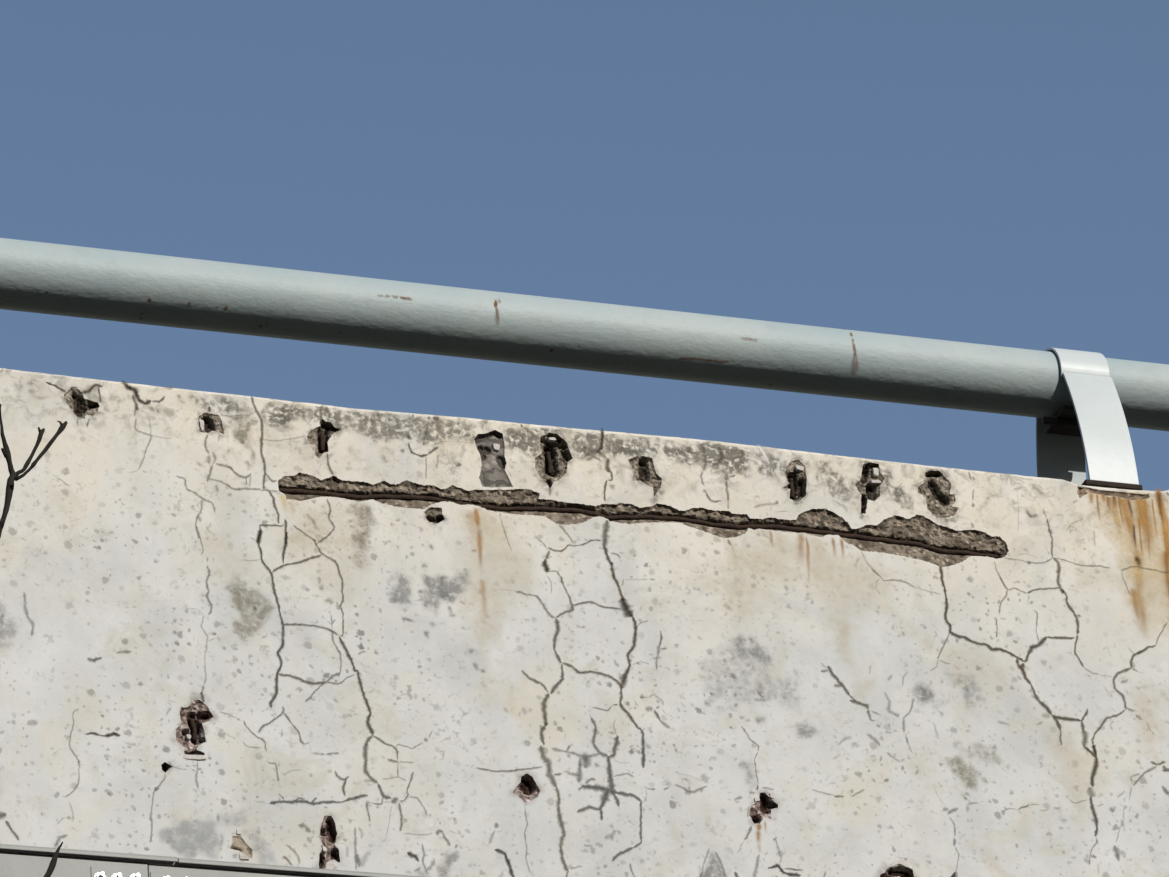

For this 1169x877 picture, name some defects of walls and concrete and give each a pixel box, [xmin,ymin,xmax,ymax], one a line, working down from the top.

spalling [47,382,102,426]
crack [122,381,172,410]
spalling [305,418,342,458]
spalling [278,430,1009,567]
rust [1090,489,1169,610]
spalling [161,698,213,773]
crack [178,396,450,866]
crack [477,428,670,877]
crack [822,666,879,744]
crack [940,510,1169,862]
spalling [319,815,340,869]
spalling [749,792,778,824]